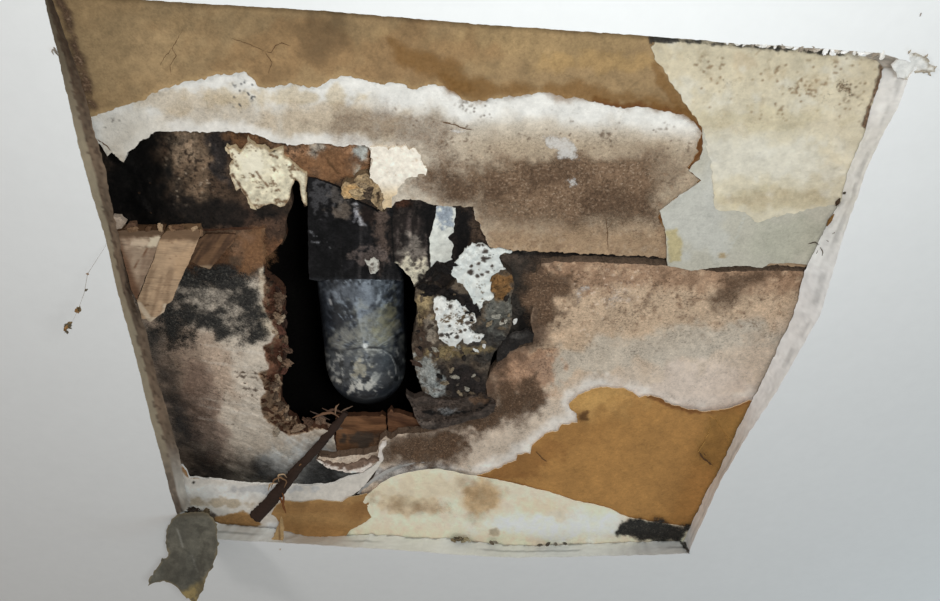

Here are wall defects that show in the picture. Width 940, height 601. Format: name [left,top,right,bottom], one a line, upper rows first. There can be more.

peeling [651,38,886,223]
spalling [225,136,308,210]
spalling [341,144,427,212]
damp [417,137,663,226]
spalling [114,214,138,229]
mould [151,264,271,351]
spalling [410,239,517,399]
damp [521,268,571,327]
damp [714,270,780,303]
damp [383,368,546,469]
spalling [316,440,387,473]
mould [615,518,691,554]